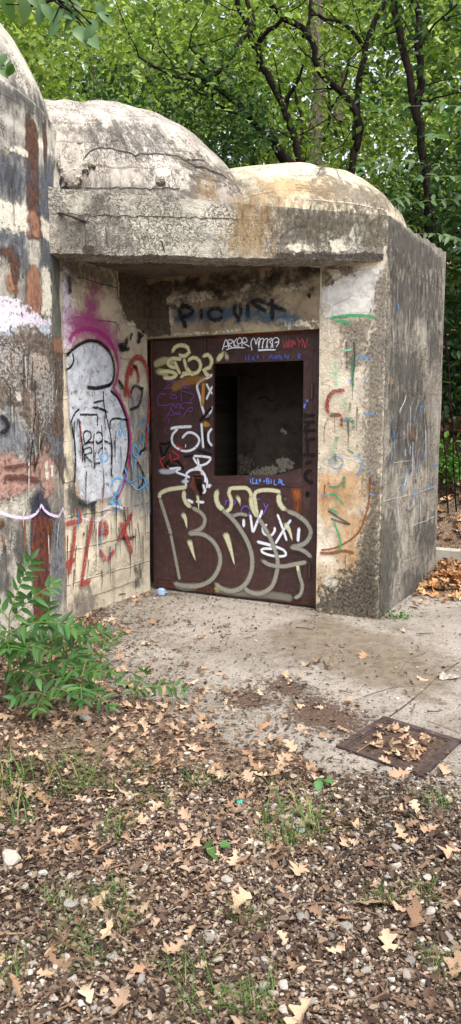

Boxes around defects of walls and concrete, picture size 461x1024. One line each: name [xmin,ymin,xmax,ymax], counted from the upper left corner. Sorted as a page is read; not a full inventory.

crack [78,140,191,161]
leakage [107,123,168,154]
leakage [171,165,446,486]
peeling [238,454,295,475]
peeling [274,236,390,620]
leakage [379,502,437,616]